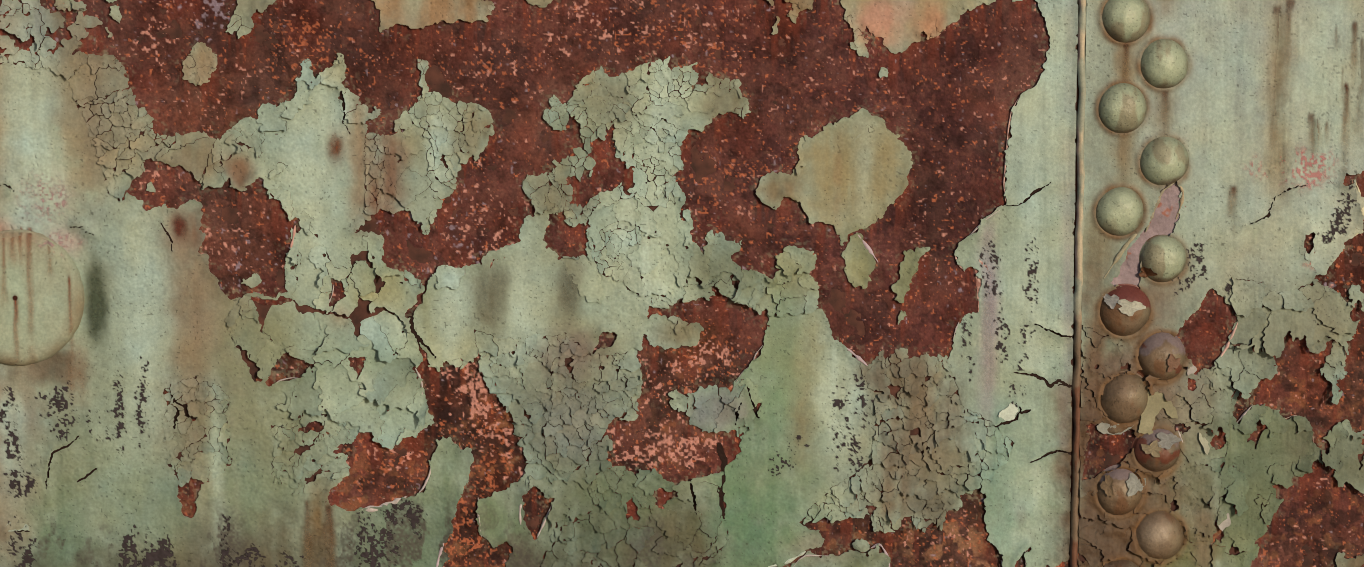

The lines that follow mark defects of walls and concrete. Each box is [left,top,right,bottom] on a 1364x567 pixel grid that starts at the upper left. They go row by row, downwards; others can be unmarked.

corrosion [1333,171,1364,197]
peeling [0,0,819,567]
corrosion [0,0,1050,567]
peeling [743,0,1364,567]
leakage [0,386,38,498]
leakage [35,357,150,453]
crack [170,392,198,429]
crack [994,372,1072,427]
crack [1030,450,1072,463]
corrosion [1173,220,1364,567]
leakage [118,513,177,567]
leakage [346,499,427,567]